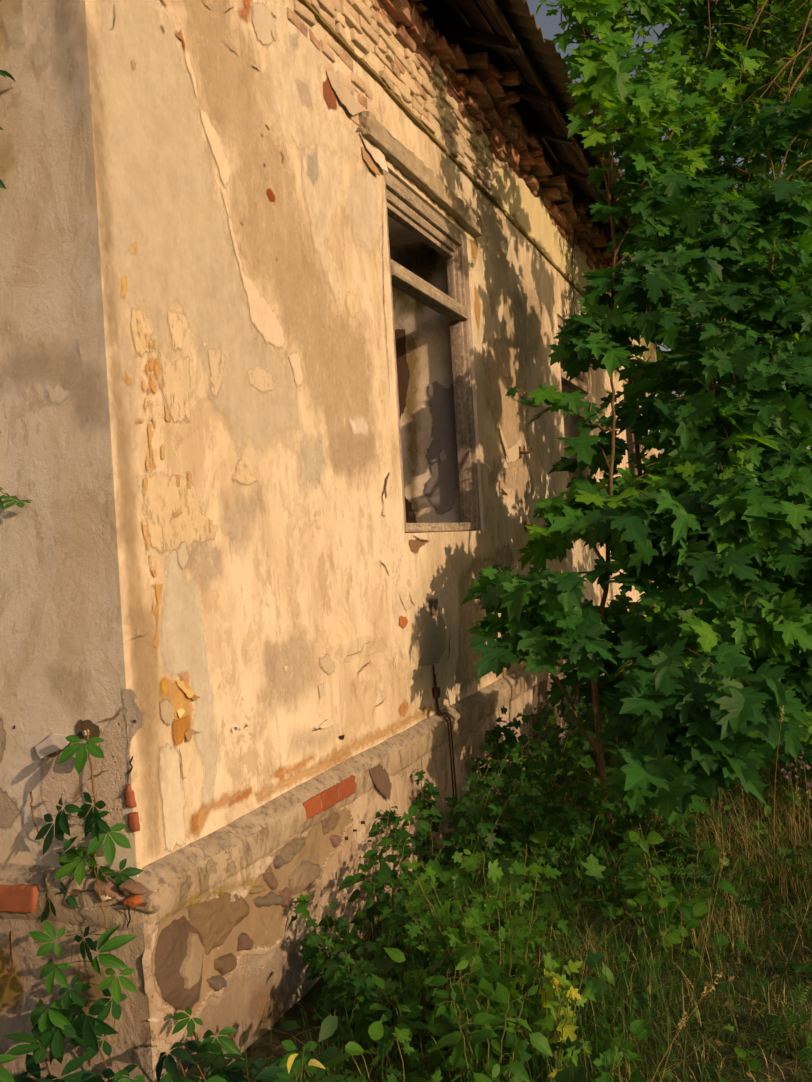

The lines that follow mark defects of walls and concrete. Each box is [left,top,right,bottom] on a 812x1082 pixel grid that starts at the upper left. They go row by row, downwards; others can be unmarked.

water stain [266,0,378,318]
flaking render [252,0,507,190]
peeling [95,0,303,817]
flaking render [485,334,533,499]
flaking render [399,546,512,690]
flaking render [0,717,16,762]
flaking render [0,788,21,828]
water stain [0,952,22,1009]
water stain [78,971,101,1010]
spalling [64,775,365,1023]